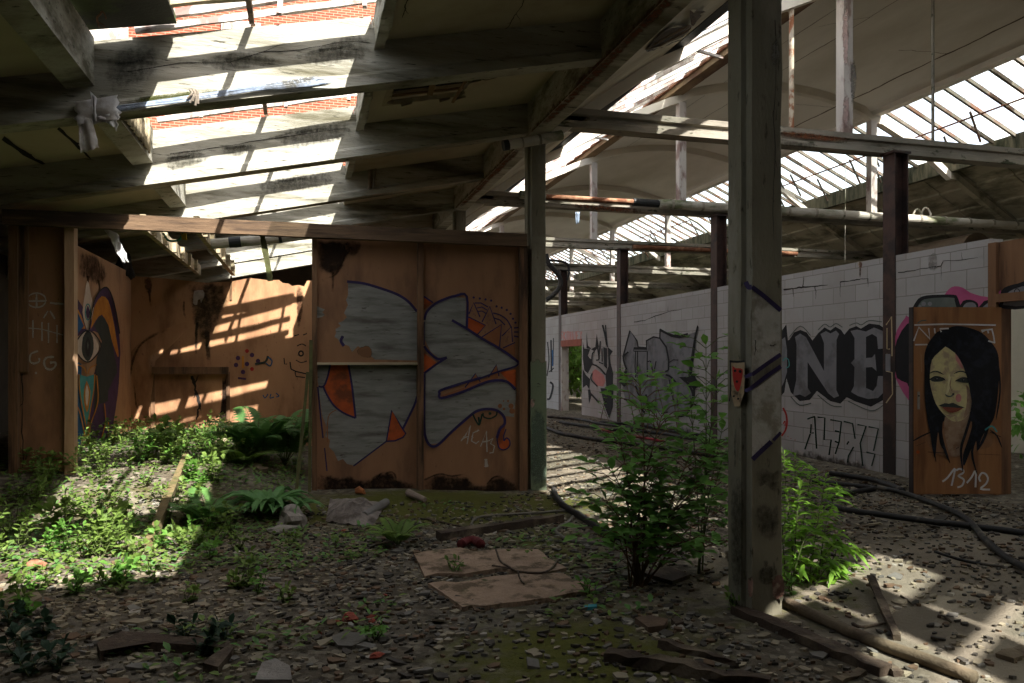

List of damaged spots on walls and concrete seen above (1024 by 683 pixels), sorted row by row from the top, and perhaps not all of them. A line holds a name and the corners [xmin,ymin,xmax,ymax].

flaking render [381,80,482,107]
leakage [319,241,360,288]
crack [783,278,868,299]
leakage [195,323,210,359]